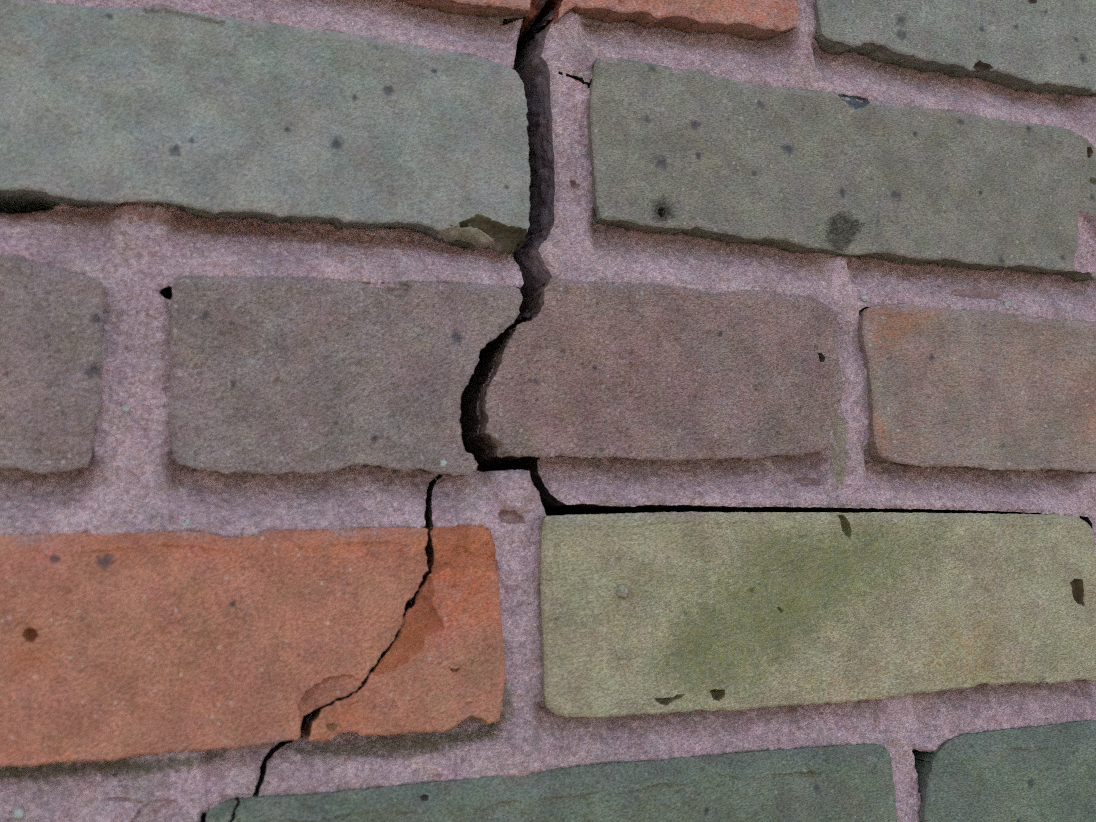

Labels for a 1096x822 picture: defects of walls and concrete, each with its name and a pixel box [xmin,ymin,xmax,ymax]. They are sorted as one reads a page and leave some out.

spalling [438,214,527,254]
spalling [1073,209,1096,273]
crack [201,0,1048,822]
crack [101,797,175,822]